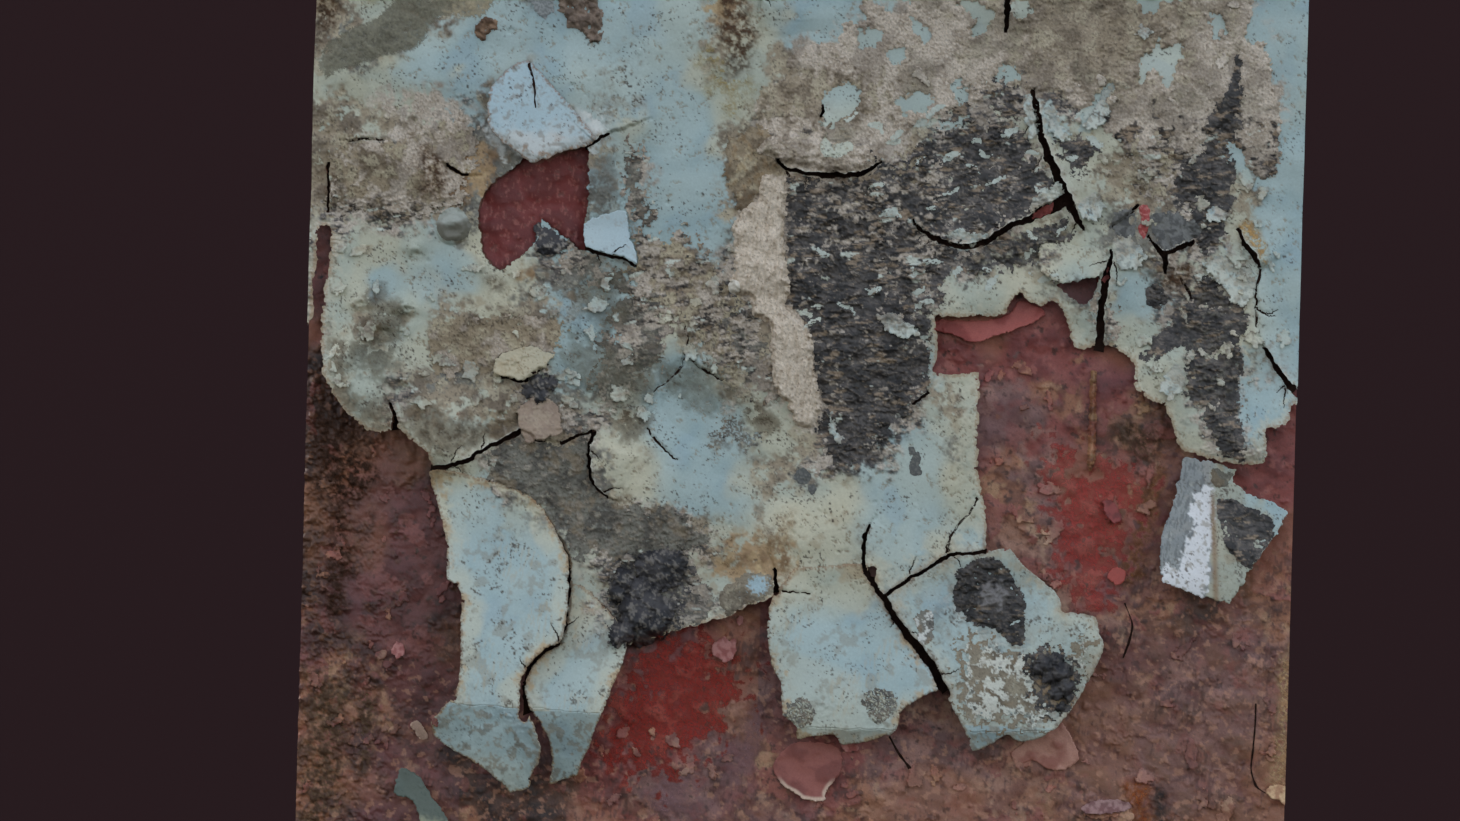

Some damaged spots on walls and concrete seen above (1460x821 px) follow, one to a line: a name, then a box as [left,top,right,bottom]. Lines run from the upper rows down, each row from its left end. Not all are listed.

crack [1003,0,1011,32]
spalling [323,61,596,226]
peeling [909,258,1045,342]
crack [913,89,1194,352]
rust [300,670,376,821]
rust [312,403,377,613]
peeling [326,469,641,793]
crack [861,497,987,694]
peeling [767,549,1106,809]
peeling [1102,457,1288,604]
peeling [1266,785,1285,805]
rust [1272,660,1289,784]